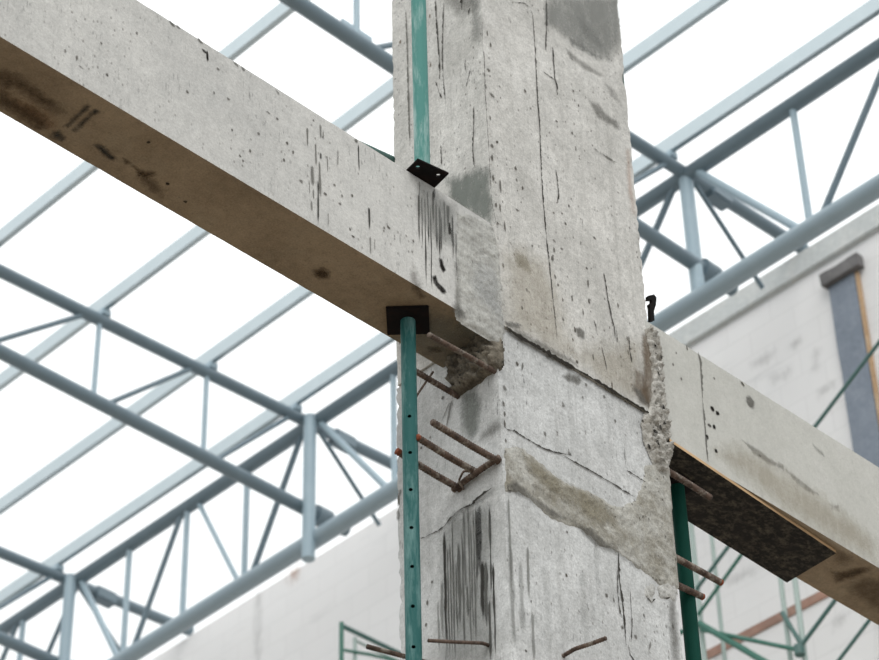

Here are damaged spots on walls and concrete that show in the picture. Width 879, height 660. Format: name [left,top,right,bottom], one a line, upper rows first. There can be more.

damp [0,73,52,129]
damp [418,171,492,282]
crack [506,0,649,413]
spalling [417,332,505,399]
crack [505,427,646,497]
crack [422,488,491,538]
damp [437,508,496,658]